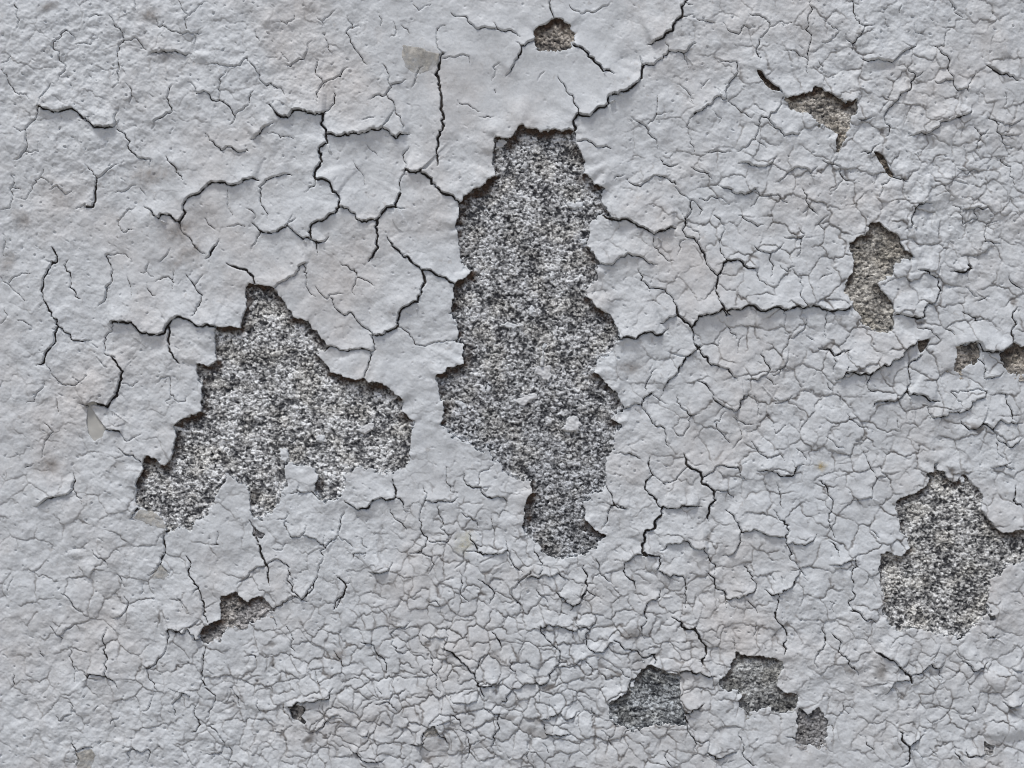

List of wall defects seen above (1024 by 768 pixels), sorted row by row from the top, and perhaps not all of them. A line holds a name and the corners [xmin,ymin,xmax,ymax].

peeling [758,72,857,152]
crack [1,1,530,468]
peeling [134,286,415,544]
peeling [435,129,624,559]
crack [237,0,1022,766]
peeling [844,223,913,333]
peeling [946,343,980,380]
crack [40,530,260,764]
peeling [200,592,275,644]
peeling [603,661,686,733]
peeling [719,651,834,750]
peeling [878,462,1024,640]